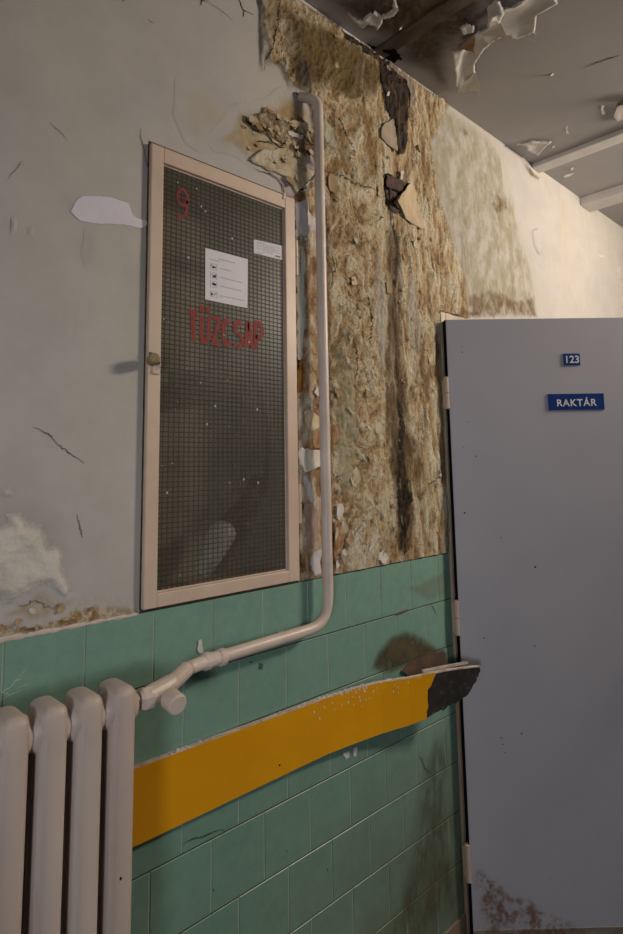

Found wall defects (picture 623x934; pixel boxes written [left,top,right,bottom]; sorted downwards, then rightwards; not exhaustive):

leakage [344,0,447,34]
leakage [405,0,477,66]
peeling [452,0,558,96]
leakage [173,16,378,197]
peeling [517,140,555,156]
peeling [601,101,623,121]
leakage [431,104,541,319]
peeling [241,0,470,581]
leakage [376,213,421,555]
corrosion [483,880,565,934]